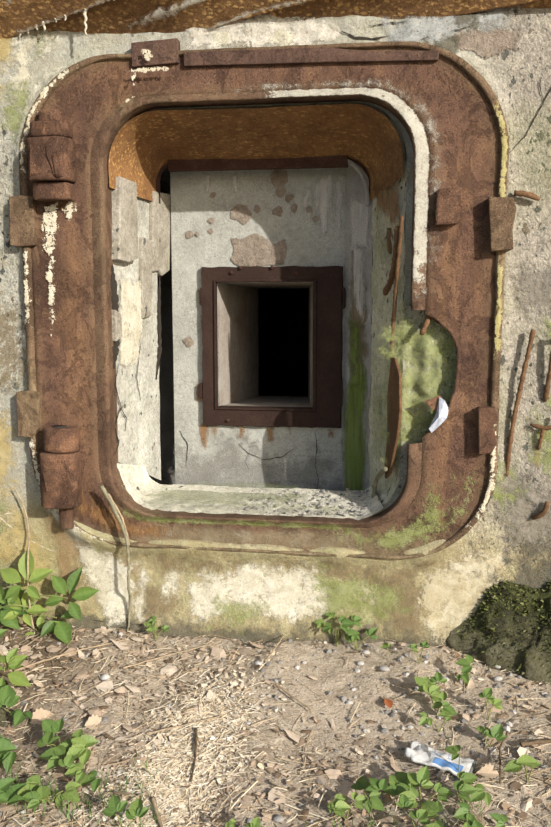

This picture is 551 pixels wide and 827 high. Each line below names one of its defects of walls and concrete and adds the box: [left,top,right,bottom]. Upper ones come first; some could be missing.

crack [341,20,408,42]
crack [440,11,493,32]
crack [513,74,551,149]
spalling [186,218,214,239]
spalling [230,204,260,225]
peeling [40,201,77,324]
peeling [231,233,287,266]
peeling [23,249,33,328]
corrosion [200,425,217,447]
crack [243,448,292,467]
corrosion [78,491,168,539]
damp [38,509,551,647]